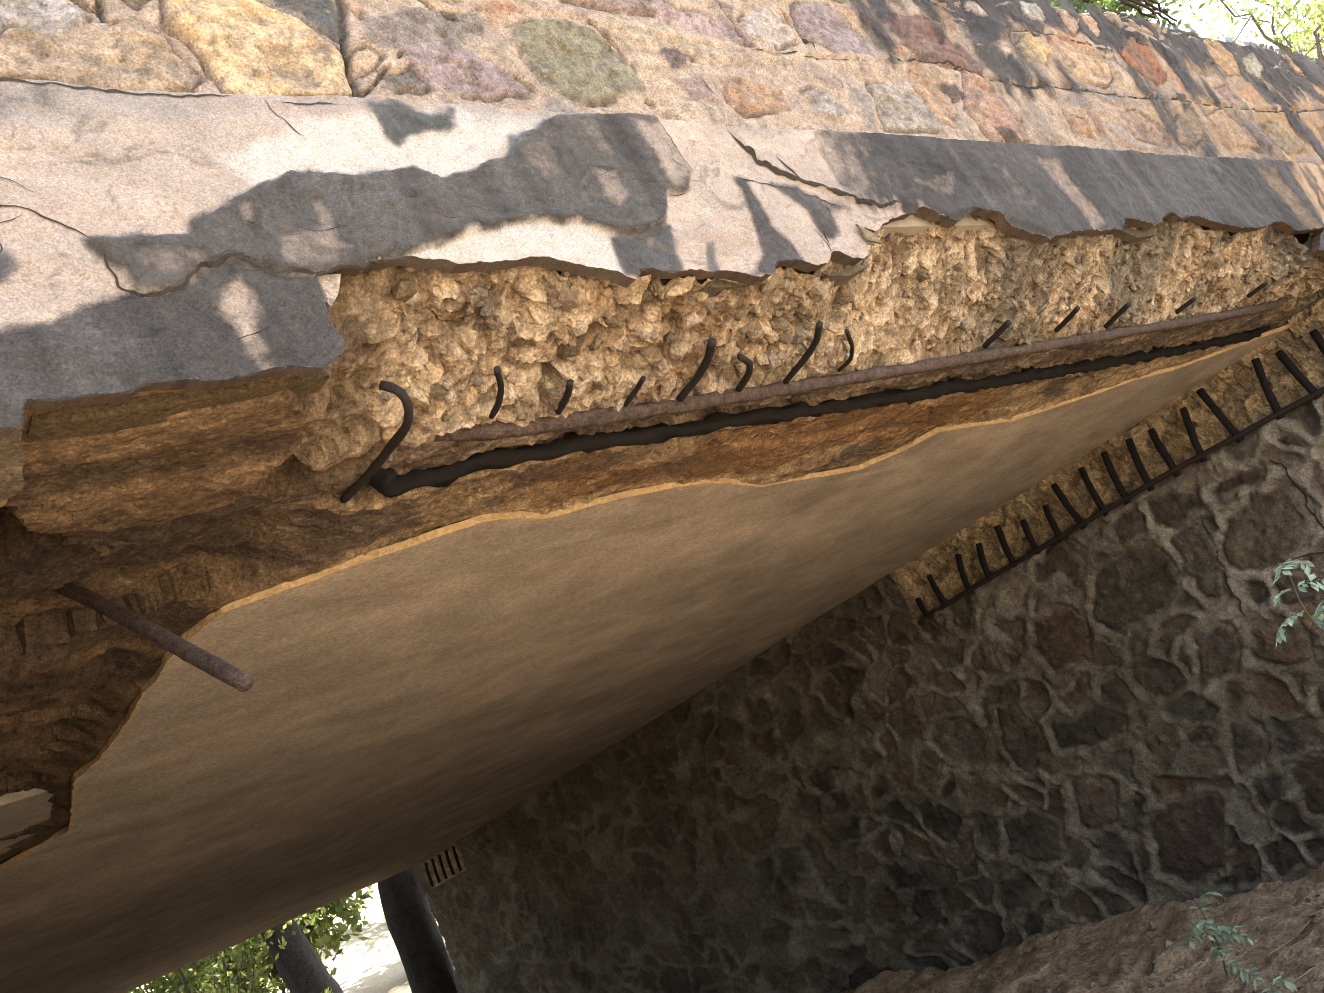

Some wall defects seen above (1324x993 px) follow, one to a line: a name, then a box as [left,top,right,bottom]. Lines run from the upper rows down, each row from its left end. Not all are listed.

crack [0,77,229,98]
crack [265,100,333,134]
crack [0,177,325,297]
crack [730,132,900,253]
rust [550,384,1027,502]
spalling [0,214,1324,865]